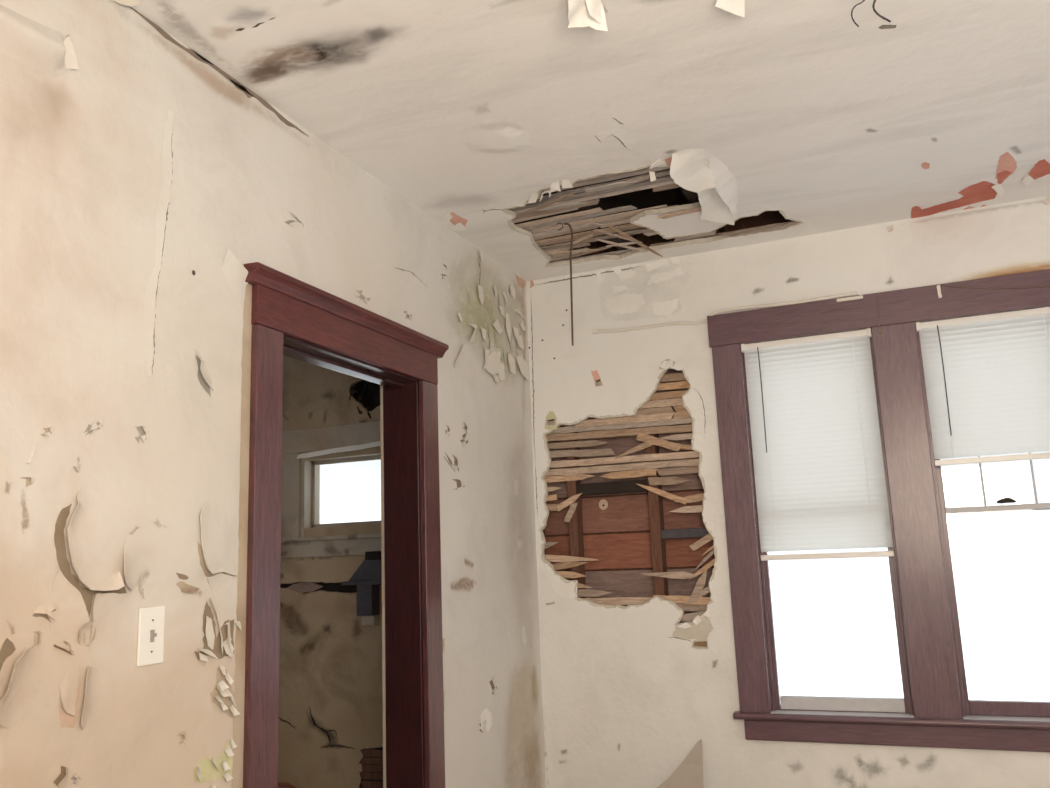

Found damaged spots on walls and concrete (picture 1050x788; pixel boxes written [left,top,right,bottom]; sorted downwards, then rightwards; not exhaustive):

crack [129,6,309,137]
peeling [528,179,573,204]
peeling [911,152,1050,218]
peeling [454,250,534,383]
flaking render [176,284,253,788]
spalling [539,359,717,650]
peeling [0,483,151,788]